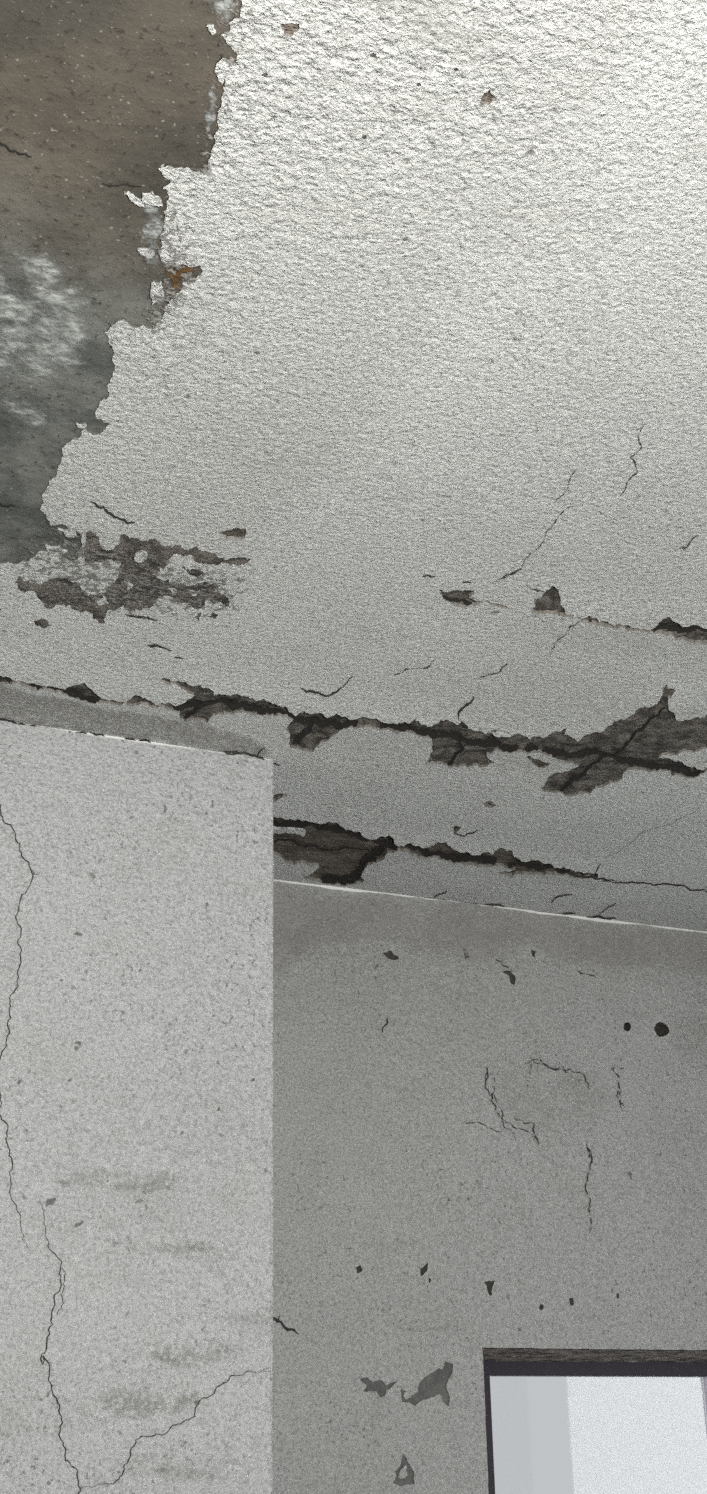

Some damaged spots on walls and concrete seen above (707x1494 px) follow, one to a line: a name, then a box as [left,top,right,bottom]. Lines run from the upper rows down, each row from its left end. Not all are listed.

flaking render [0,0,300,628]
crack [620,424,645,496]
crack [423,471,576,592]
spalling [439,589,508,609]
spalling [529,586,574,617]
crack [0,614,707,920]
spalling [526,756,549,769]
crack [463,1059,625,1144]
crack [0,804,270,1494]
crack [585,1145,593,1233]
peeling [360,1361,453,1406]
peeling [393,1455,415,1486]